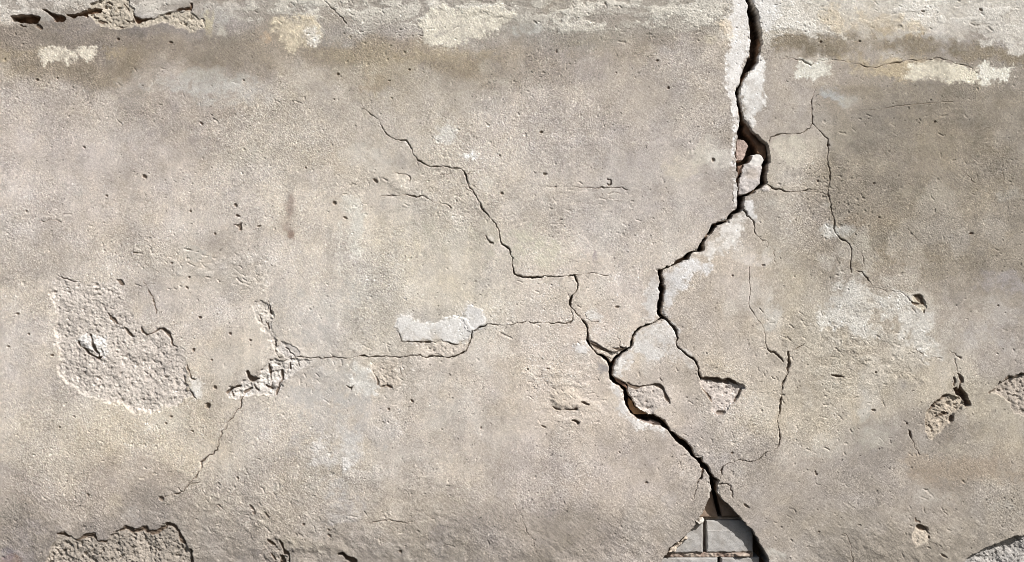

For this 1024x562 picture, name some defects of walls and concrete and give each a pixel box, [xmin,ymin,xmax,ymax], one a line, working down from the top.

spalling [12,0,206,41]
crack [275,0,978,506]
spalling [49,274,312,425]
spalling [925,394,964,440]
spalling [988,373,1024,417]
crack [165,396,244,497]
spalling [46,522,194,562]
crack [367,517,419,525]
spalling [711,487,769,562]